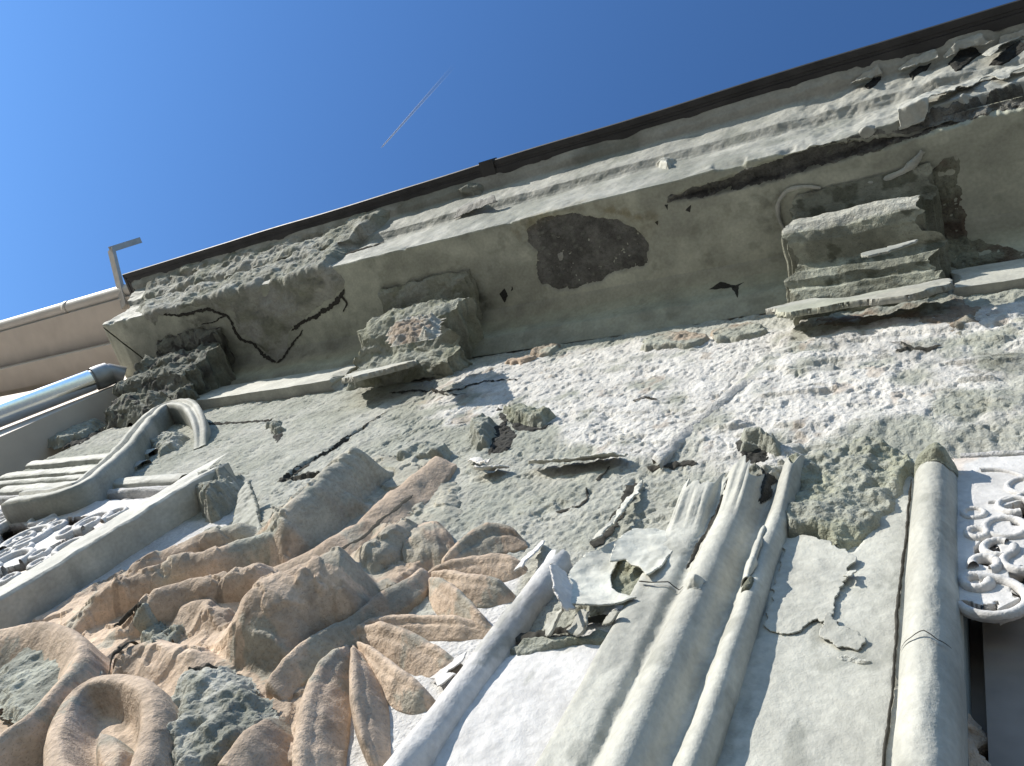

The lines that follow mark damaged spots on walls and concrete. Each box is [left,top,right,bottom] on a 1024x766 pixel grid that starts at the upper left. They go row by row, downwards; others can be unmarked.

flaking render [665,29,1024,229]
flaking render [527,212,649,289]
crack [164,289,348,364]
flaking render [385,312,445,347]
crack [277,378,519,482]
peeling [528,452,628,464]
peeling [510,480,672,656]
flaking render [735,426,959,665]
flaking render [166,666,279,766]